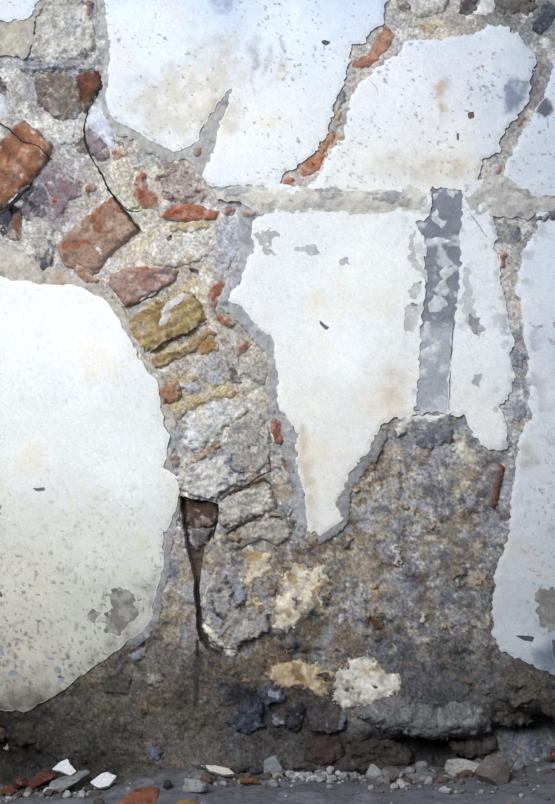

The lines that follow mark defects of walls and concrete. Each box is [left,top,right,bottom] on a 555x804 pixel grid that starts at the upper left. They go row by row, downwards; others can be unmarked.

crack [0,182,33,215]
crack [0,123,52,160]
crack [83,85,140,230]
spalling [0,0,319,567]
spalling [280,0,555,187]
peeling [429,188,455,244]
crack [180,456,278,709]
spalling [0,214,555,790]